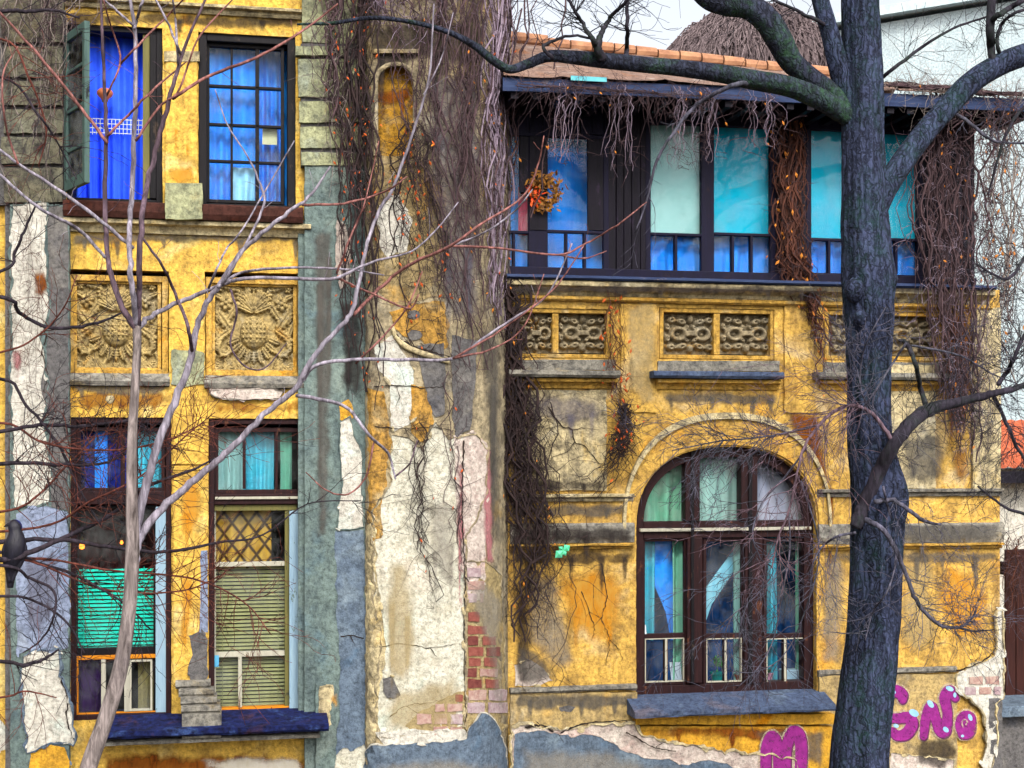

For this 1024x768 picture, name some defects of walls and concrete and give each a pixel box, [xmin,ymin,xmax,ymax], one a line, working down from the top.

flaking render [7,201,53,509]
flaking render [16,645,78,768]
crack [534,407,599,463]
flaking render [335,335,798,768]
water stain [513,394,833,681]
flaking render [954,607,1007,768]